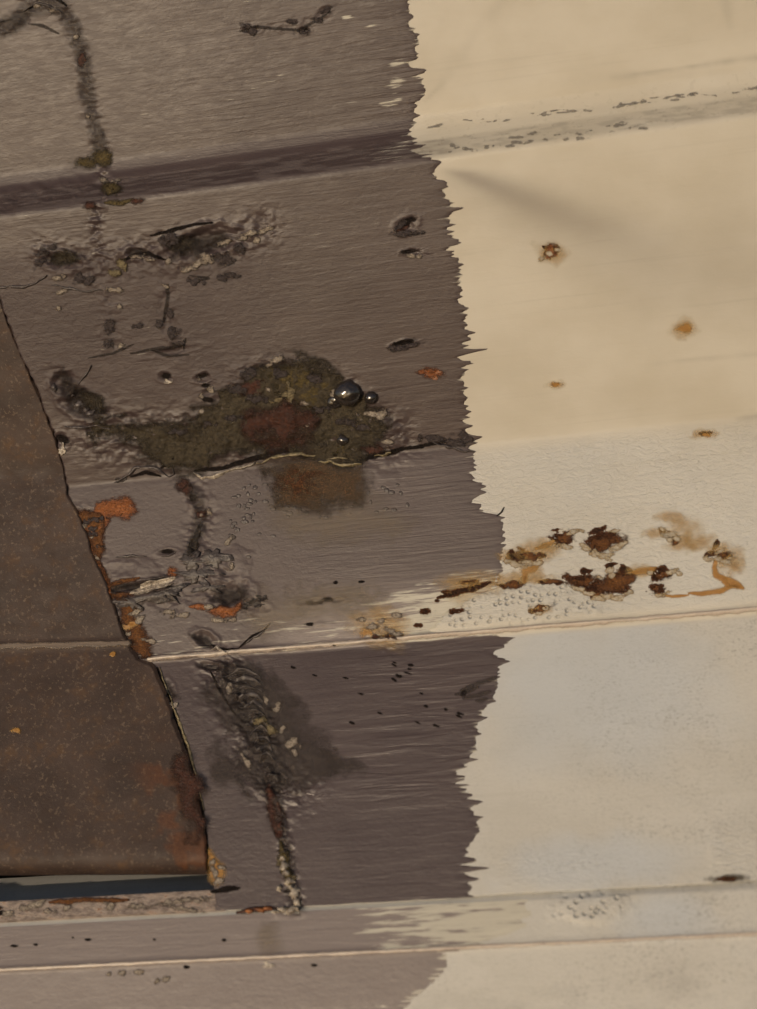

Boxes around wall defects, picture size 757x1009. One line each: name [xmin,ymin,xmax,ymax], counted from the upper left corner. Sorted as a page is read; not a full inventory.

corrosion [538,243,561,261]
corrosion [77,495,157,659]
peeling [107,535,236,619]
peeling [239,595,267,610]
corrosion [356,612,403,640]
corrosion [413,515,744,628]
leakage [203,662,360,796]
corrosion [264,783,293,885]
corrosion [0,848,300,923]